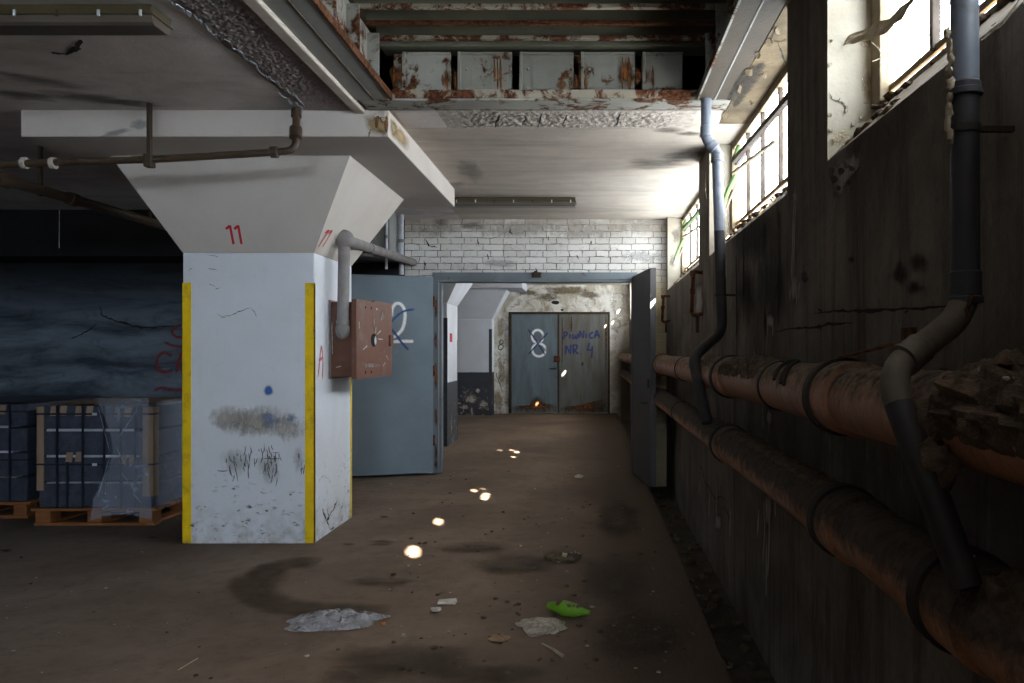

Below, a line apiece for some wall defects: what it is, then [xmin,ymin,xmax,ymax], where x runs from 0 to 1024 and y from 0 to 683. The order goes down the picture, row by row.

corrosion [390,57,407,87]
corrosion [442,68,457,90]
corrosion [492,56,502,90]
corrosion [557,55,587,90]
corrosion [619,56,654,90]
peeling [738,27,781,105]
corrosion [368,115,406,145]
crack [69,308,174,340]
crack [776,305,947,332]
corrosion [516,398,605,412]